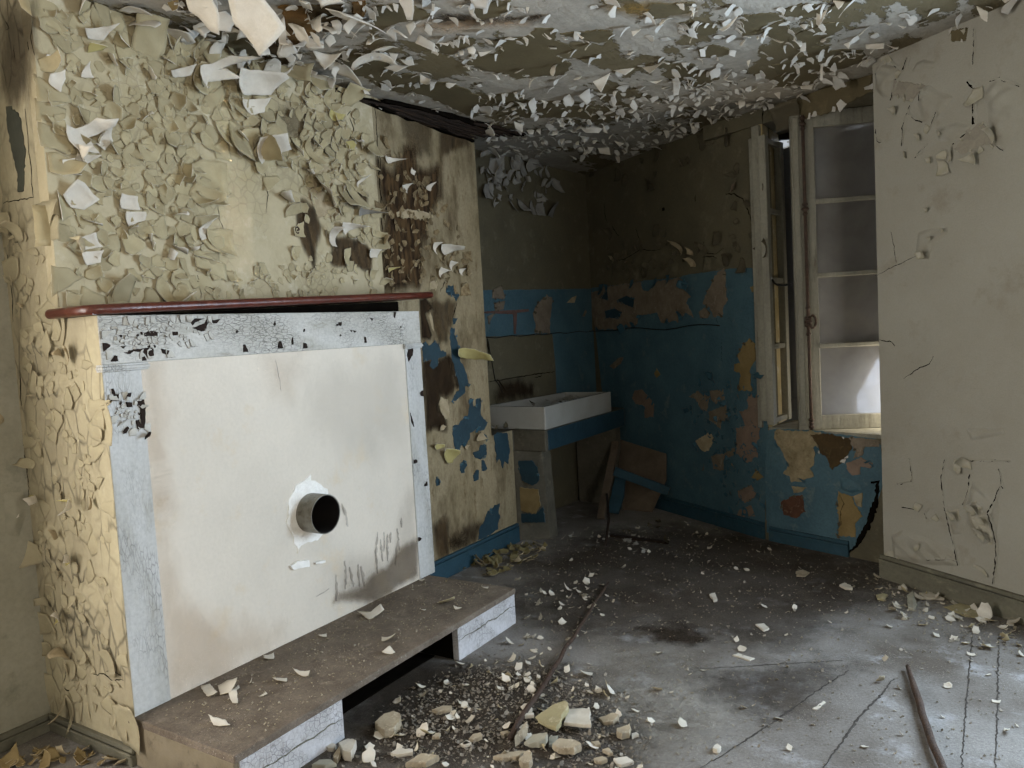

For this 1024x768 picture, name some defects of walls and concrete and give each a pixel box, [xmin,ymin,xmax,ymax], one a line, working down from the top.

peeling [880,8,940,29]
flaking render [948,13,968,42]
peeling [976,0,1018,22]
crack [875,28,1021,158]
peeling [0,0,899,454]
peeling [19,389,151,755]
flaking render [689,338,763,517]
flaking render [774,429,880,518]
flaking render [835,491,863,538]
crack [897,458,1011,584]
leakage [650,627,707,645]
crack [960,633,1000,767]